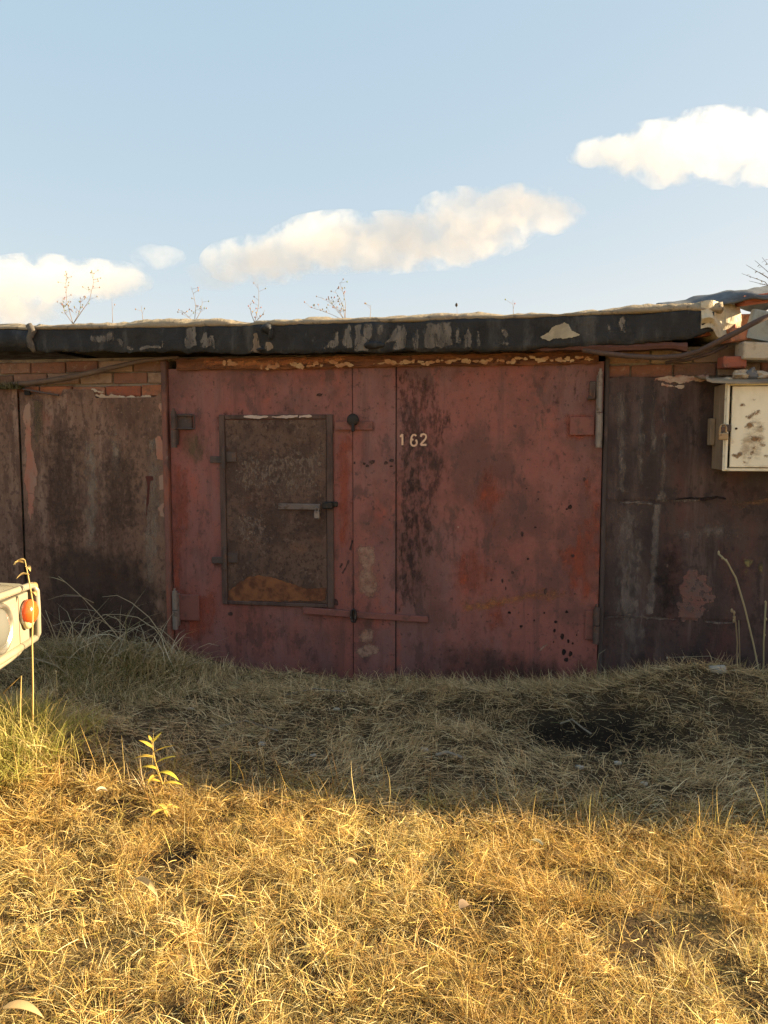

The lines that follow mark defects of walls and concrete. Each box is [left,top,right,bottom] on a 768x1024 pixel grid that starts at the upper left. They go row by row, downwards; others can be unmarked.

peeling [117,338,163,351]
peeling [184,326,215,349]
peeling [249,333,273,353]
peeling [323,324,369,351]
spalling [541,322,580,341]
spalling [685,300,742,347]
corrosion [732,404,766,463]
water stain [46,431,159,645]
water stain [617,408,677,654]